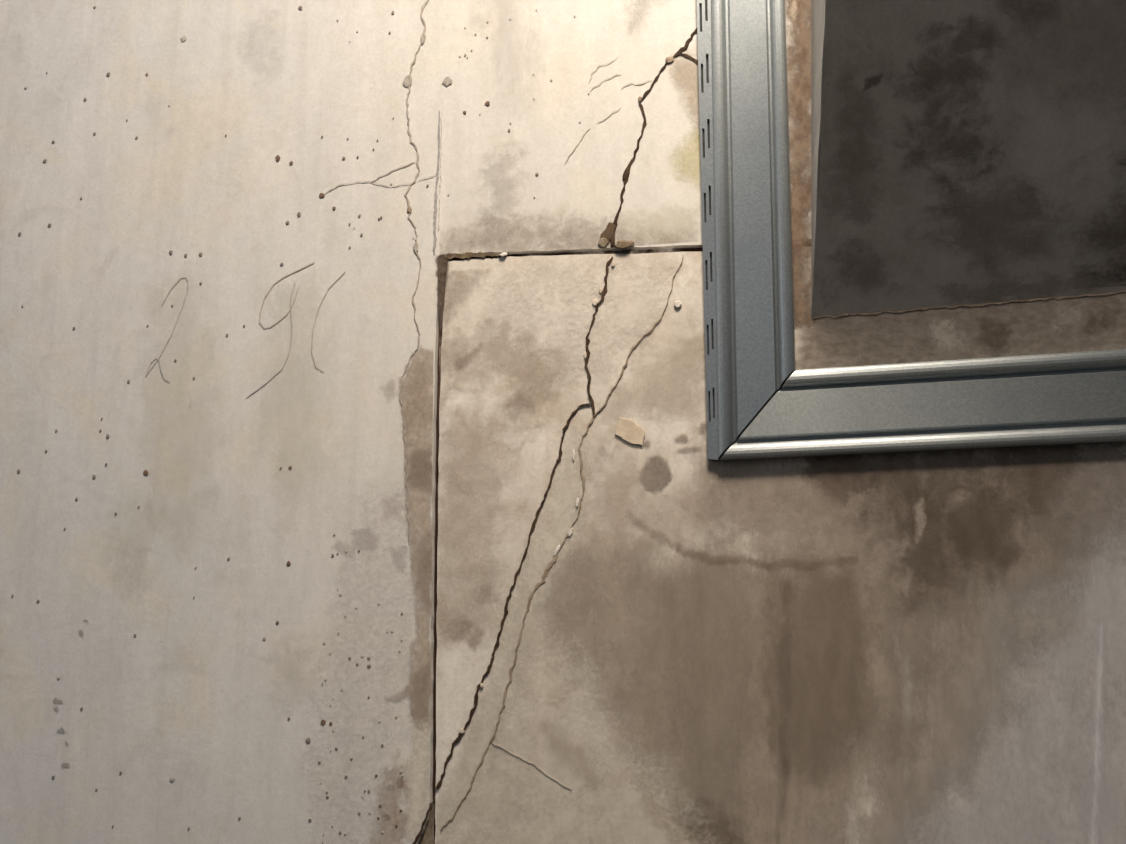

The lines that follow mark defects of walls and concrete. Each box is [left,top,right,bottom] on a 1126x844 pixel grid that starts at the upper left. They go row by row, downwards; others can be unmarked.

crack [326,0,443,545]
damp [404,722,429,839]
crack [435,28,698,831]
damp [438,424,1126,844]
damp [786,0,1126,370]